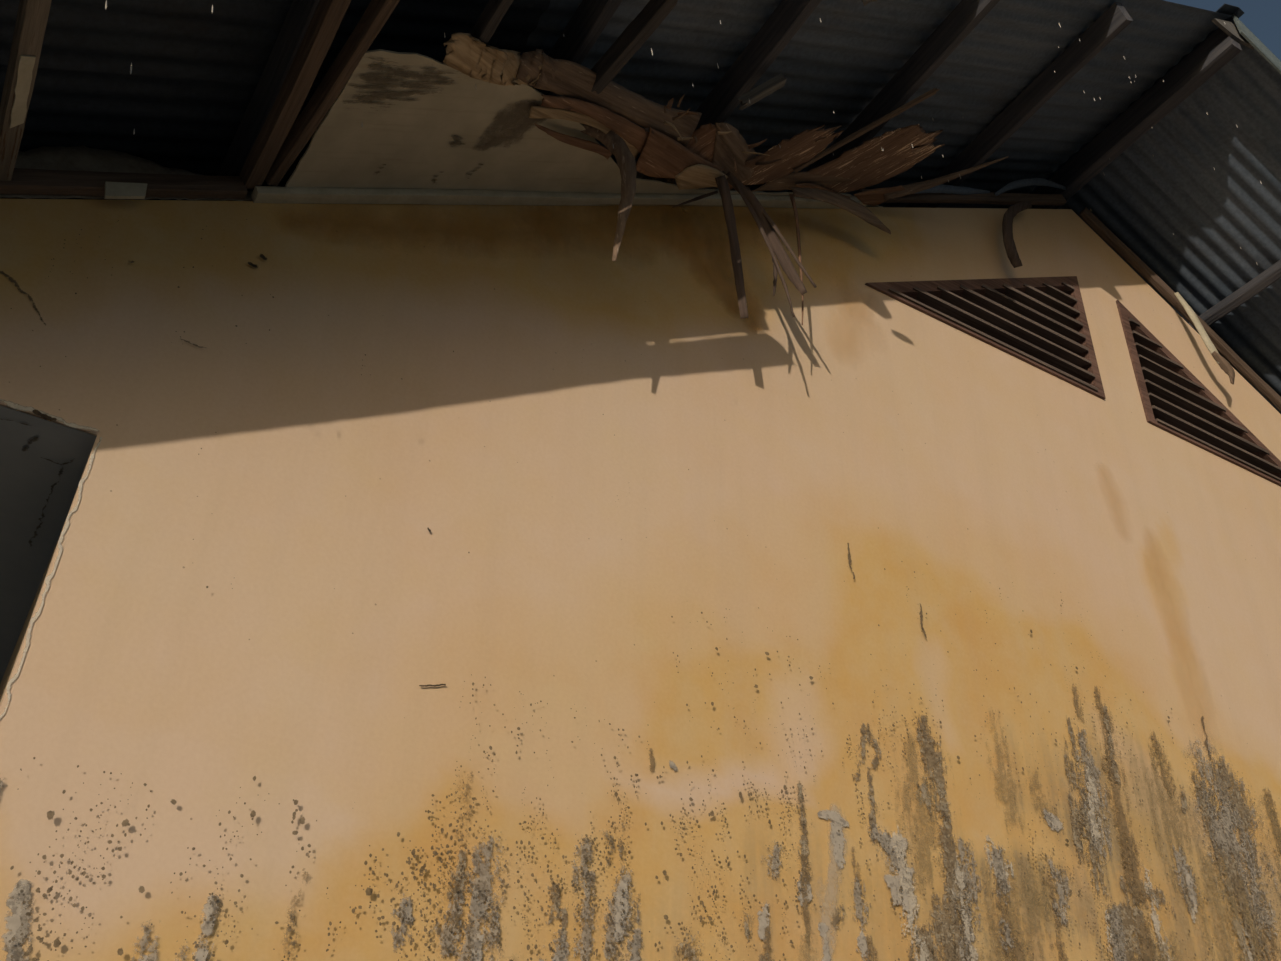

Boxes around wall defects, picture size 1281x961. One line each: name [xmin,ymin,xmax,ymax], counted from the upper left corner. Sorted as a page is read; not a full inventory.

crack [0,271,45,324]
peeling [0,399,102,719]
peeling [2,879,32,961]
damp [5,771,151,961]
damp [117,923,158,961]
peeling [175,893,222,961]
damp [170,776,317,961]
peeling [744,904,775,961]
damp [326,664,1281,961]
peeling [817,806,849,961]
peeling [867,822,920,944]
peeling [984,836,1014,953]